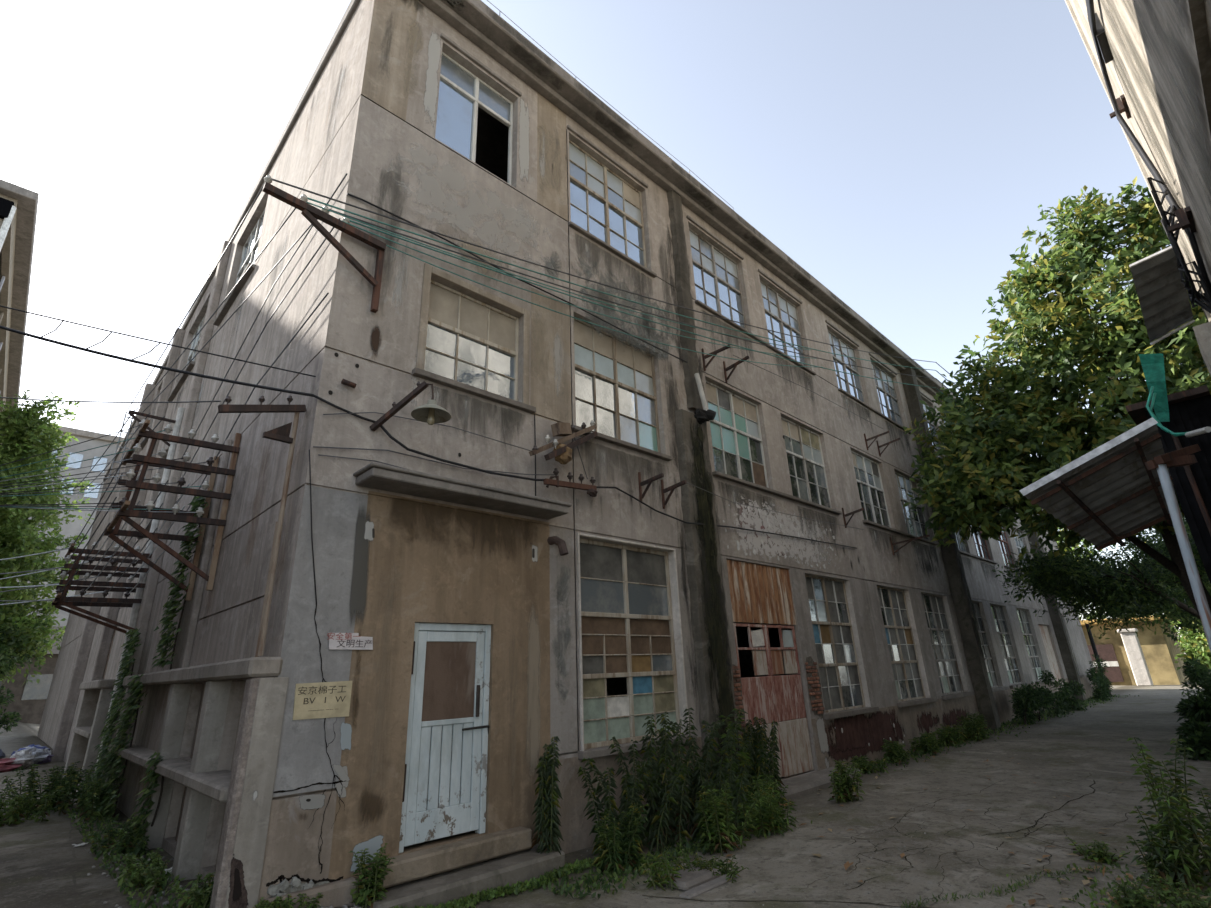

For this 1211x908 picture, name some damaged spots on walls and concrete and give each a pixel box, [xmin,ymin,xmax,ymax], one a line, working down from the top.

damp [493,13,559,89]
peeling [723,495,837,569]
damp [690,425,783,771]
crack [314,605,326,682]
peeling [805,656,969,761]